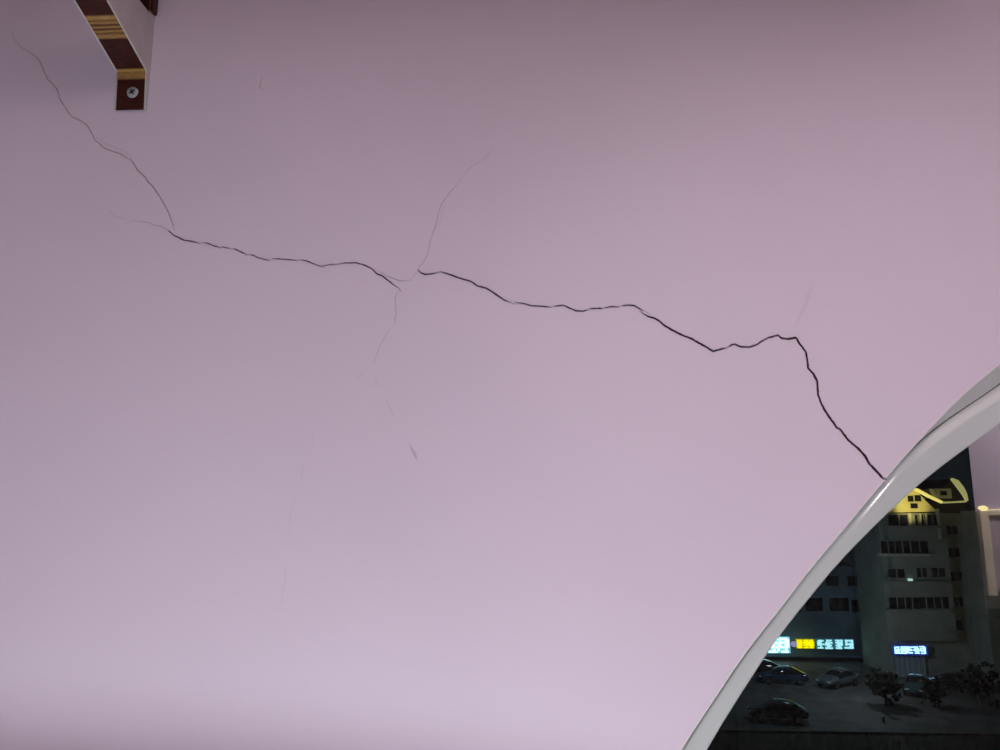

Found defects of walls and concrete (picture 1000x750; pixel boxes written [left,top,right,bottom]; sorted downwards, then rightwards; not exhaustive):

crack [167,231,398,290]
crack [416,268,887,482]